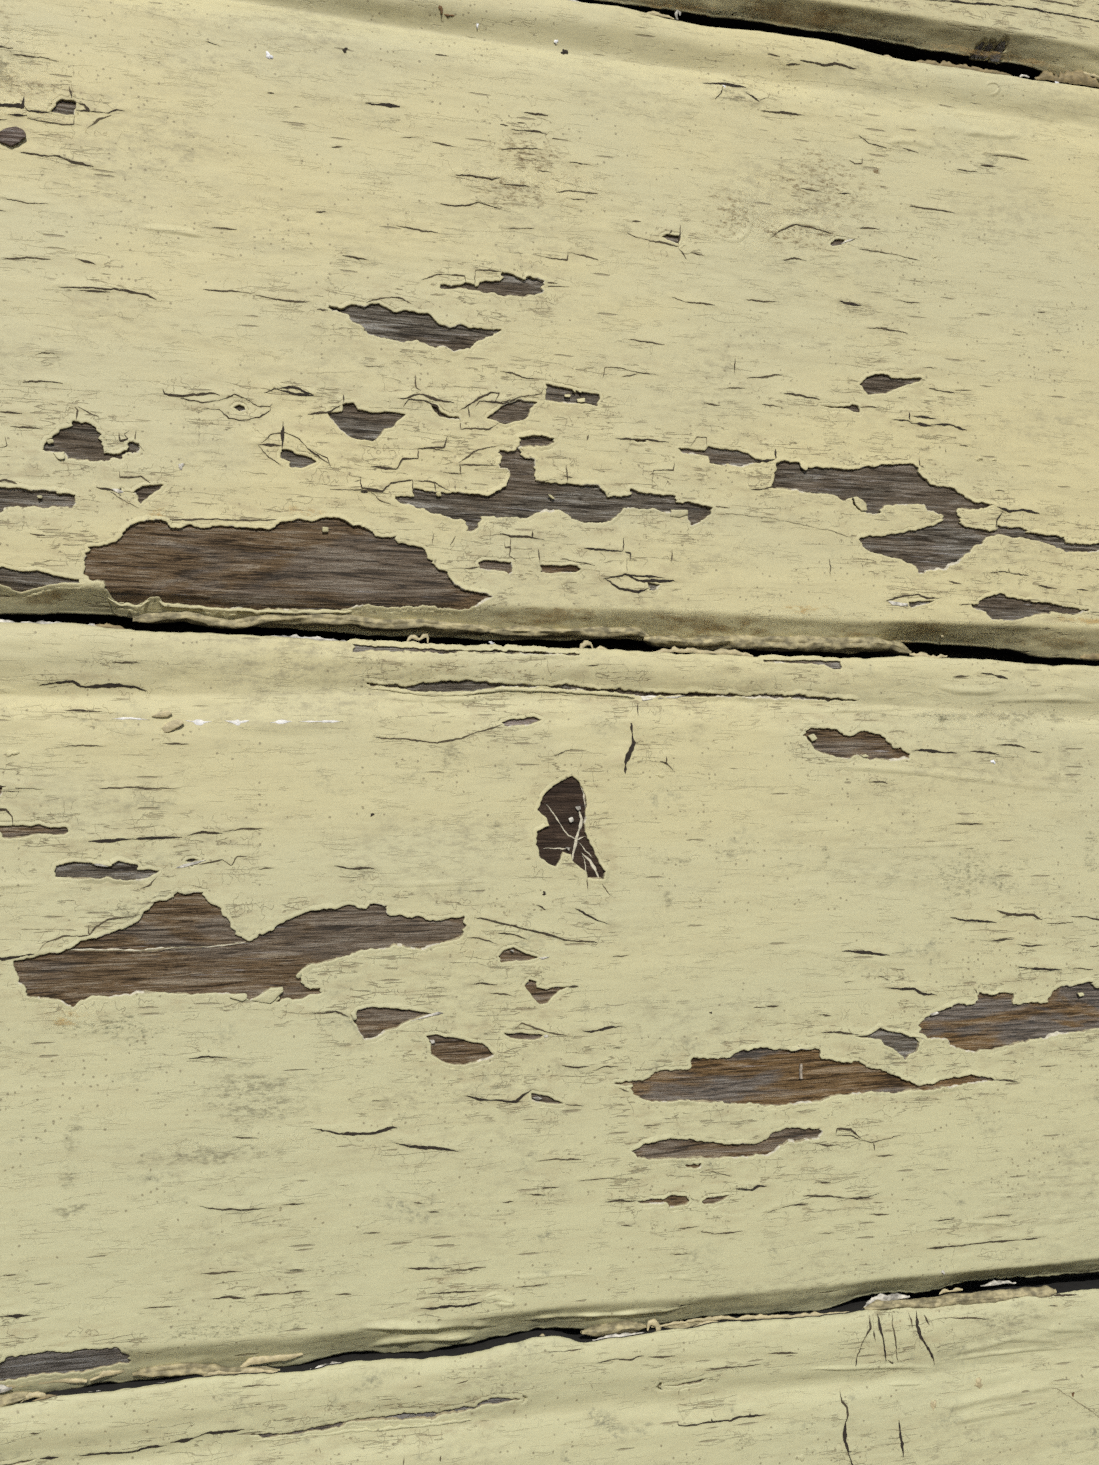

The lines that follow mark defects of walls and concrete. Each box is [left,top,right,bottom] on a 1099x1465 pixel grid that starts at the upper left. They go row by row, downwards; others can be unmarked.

peeling [324,299,506,357]
peeling [0,480,516,616]
peeling [324,399,410,446]
peeling [391,380,717,536]
peeling [674,442,1099,578]
peeling [347,639,862,705]
peeling [799,723,914,764]
peeling [532,771,610,885]
peeling [8,855,471,1012]
peeling [610,977,1099,1172]
crack [1050,1294,1077,1306]
crack [840,1311,986,1465]